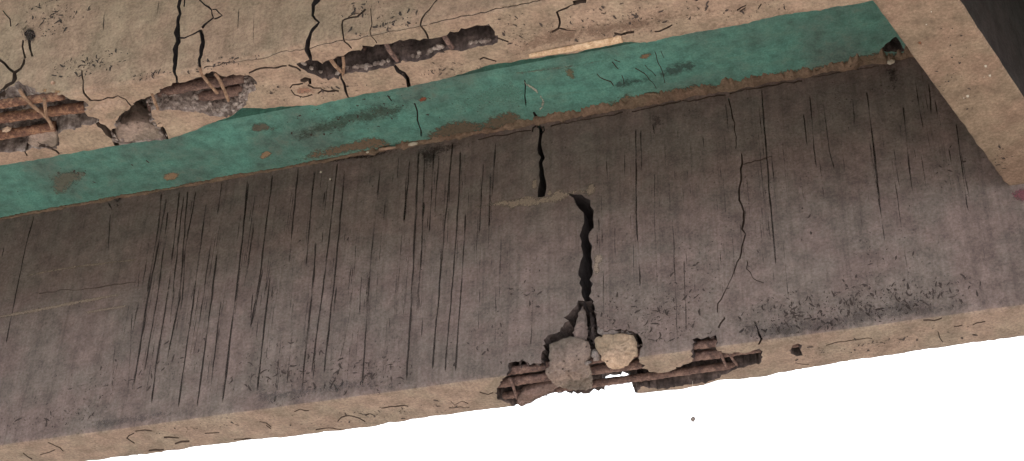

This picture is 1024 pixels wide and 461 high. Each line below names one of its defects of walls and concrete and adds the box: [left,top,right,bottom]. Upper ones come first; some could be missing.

crack [0,13,33,98]
crack [172,0,586,98]
spalling [297,15,498,80]
crack [81,70,131,145]
spalling [0,65,257,153]
crack [387,65,422,136]
crack [478,24,875,328]
spalling [495,300,763,406]